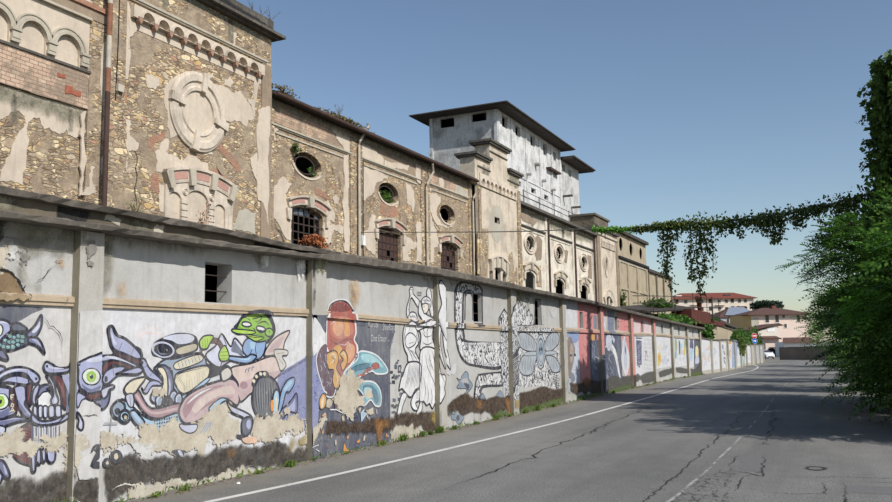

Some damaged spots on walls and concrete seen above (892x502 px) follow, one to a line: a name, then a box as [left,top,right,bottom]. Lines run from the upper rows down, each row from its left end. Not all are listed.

spalling [0,240,31,294]
damp [447,363,701,417]
peeling [0,368,374,477]
damp [327,411,436,434]
damp [0,440,314,502]